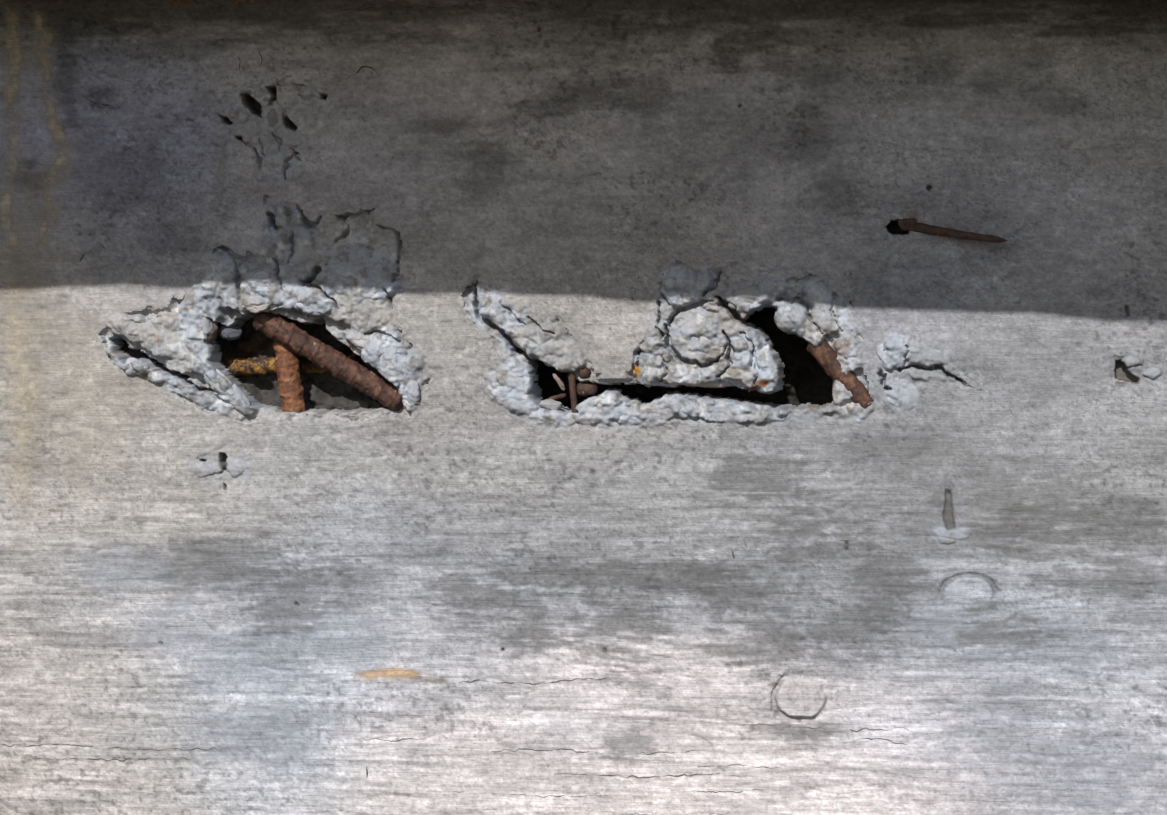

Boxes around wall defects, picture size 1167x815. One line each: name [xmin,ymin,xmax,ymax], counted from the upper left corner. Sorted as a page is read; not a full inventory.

spalling [96,74,433,428]
spalling [458,256,976,437]